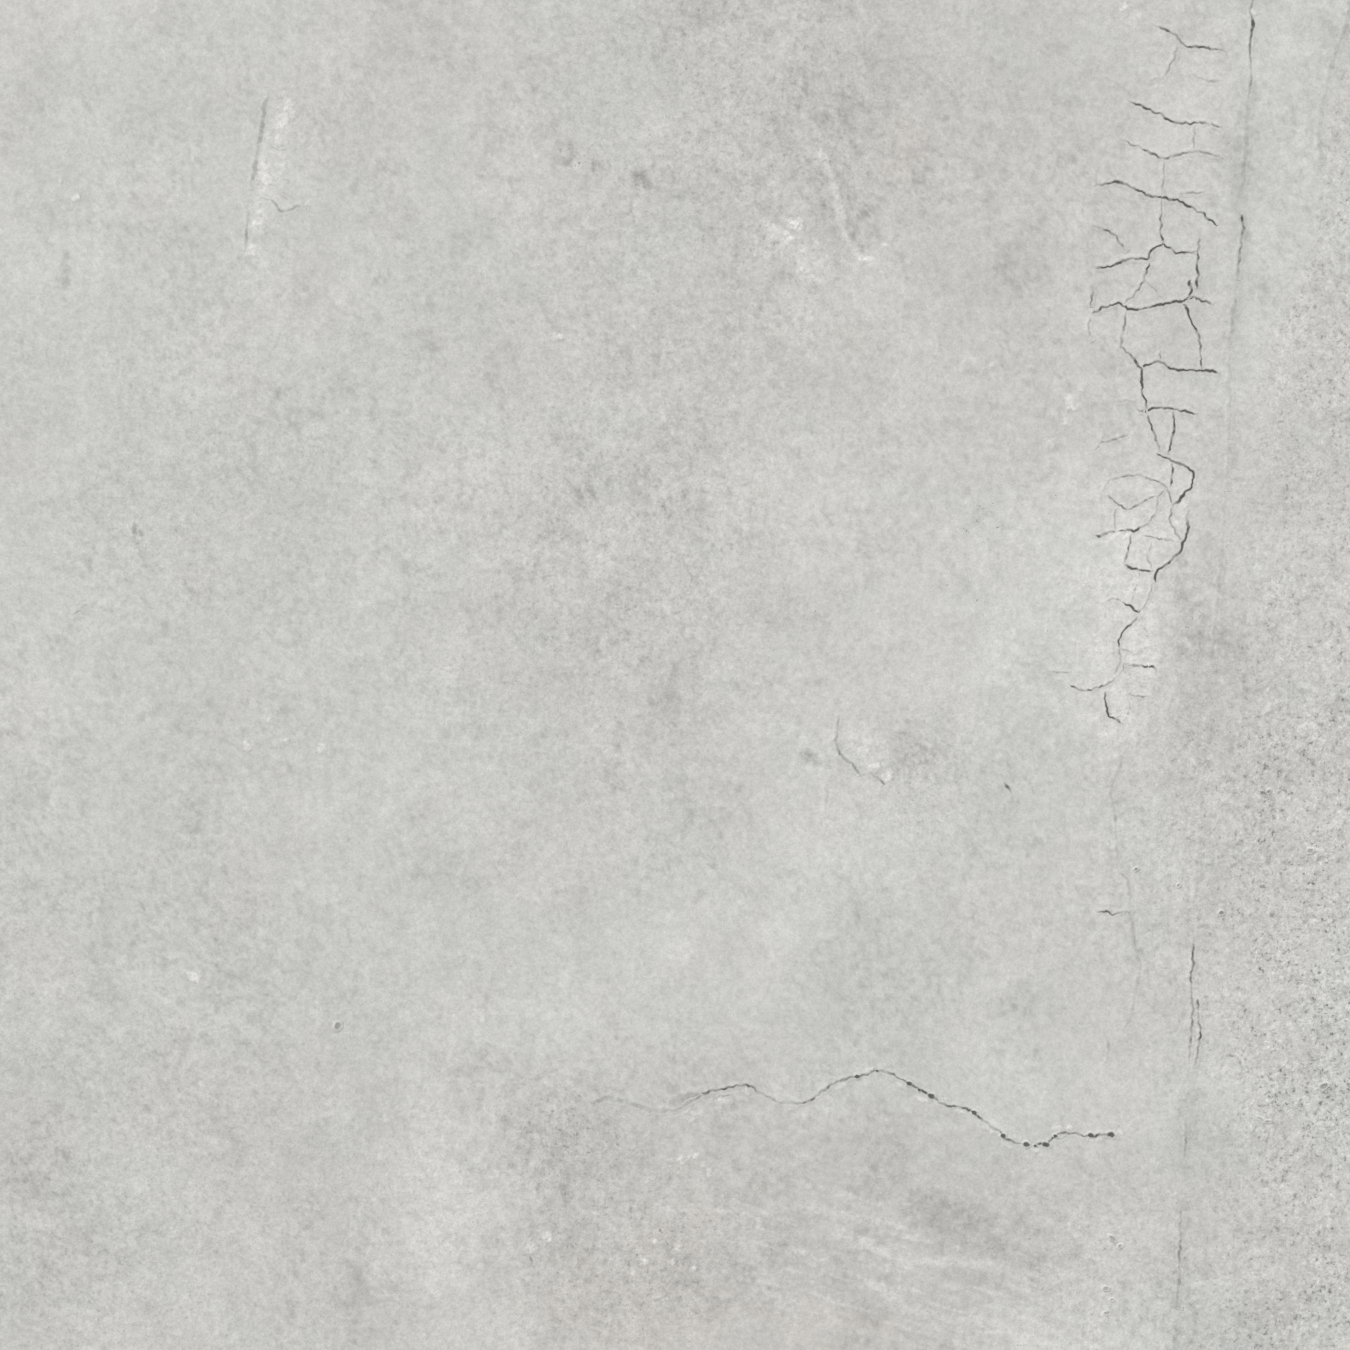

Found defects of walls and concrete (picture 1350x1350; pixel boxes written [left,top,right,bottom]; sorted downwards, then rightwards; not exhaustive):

crack [1047,0,1261,726]
crack [1185,718,1213,1069]
crack [588,1062,1125,1155]